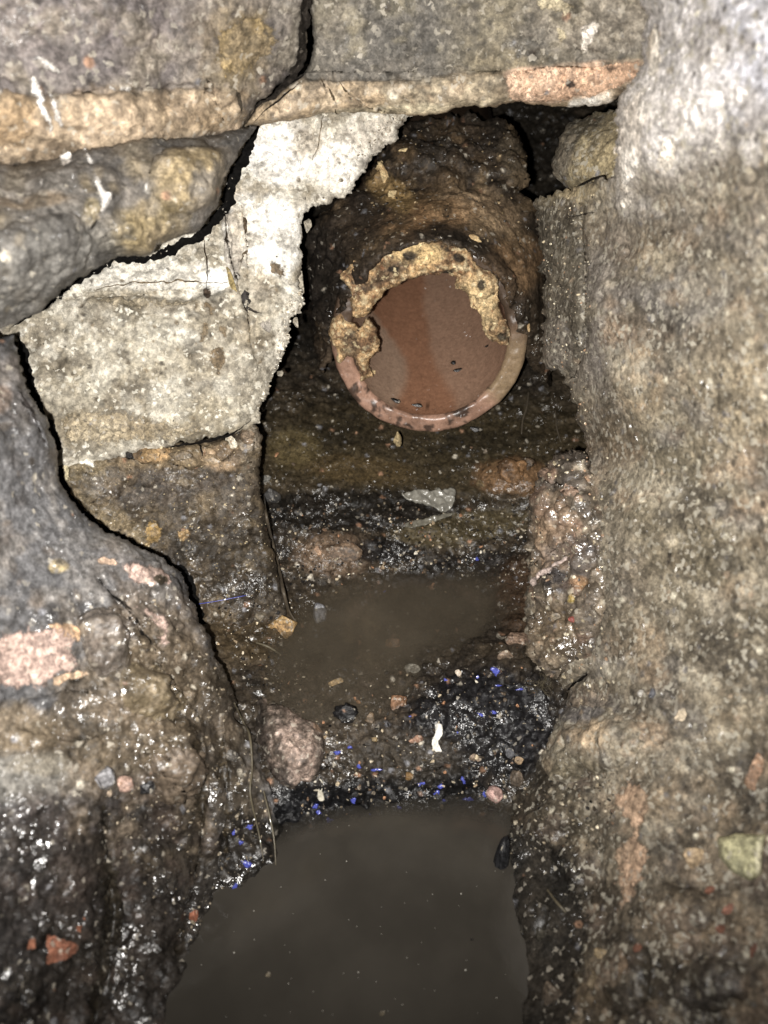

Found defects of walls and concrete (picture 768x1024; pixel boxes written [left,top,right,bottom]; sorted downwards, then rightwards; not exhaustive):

crack [11,0,385,624]
leakage [87,804,123,1024]
leakage [193,778,209,879]